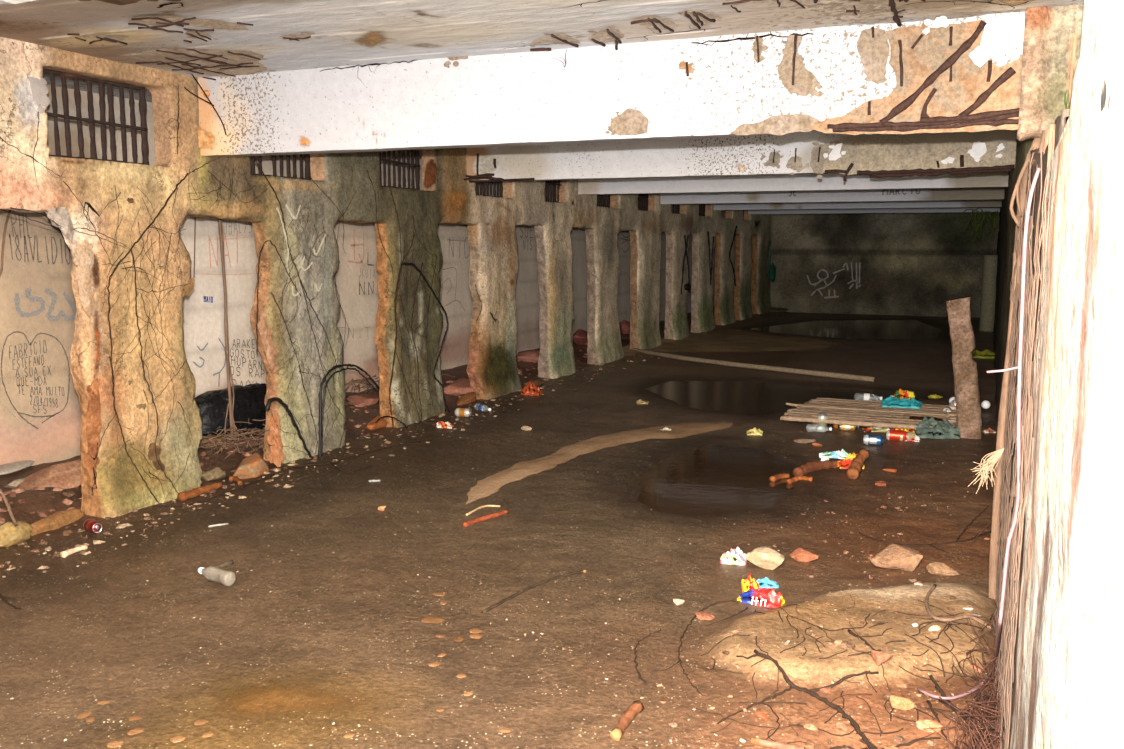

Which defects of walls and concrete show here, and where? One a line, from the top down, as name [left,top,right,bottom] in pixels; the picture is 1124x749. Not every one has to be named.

spalling [530,0,761,51]
peeling [679,61,695,80]
spalling [730,0,1022,181]
peeling [605,107,651,135]
spalling [47,207,95,318]
leakage [485,346,514,385]